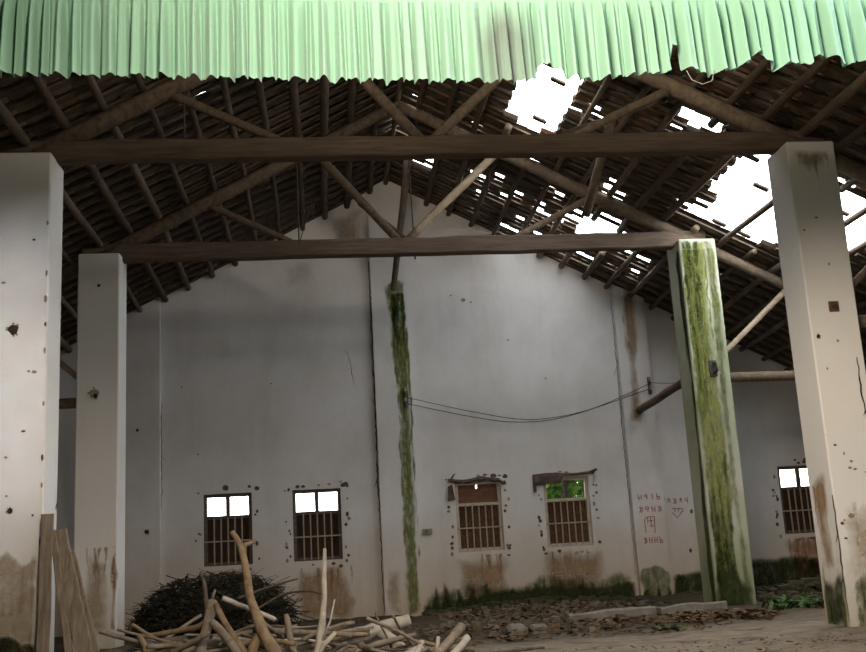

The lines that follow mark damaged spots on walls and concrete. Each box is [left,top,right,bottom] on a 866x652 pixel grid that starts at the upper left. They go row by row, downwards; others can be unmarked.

spalling [6,322,19,337]
corrosion [625,293,635,359]
crack [856,357,866,414]
leakage [302,569,348,616]
leakage [464,554,502,594]
leakage [550,556,598,588]